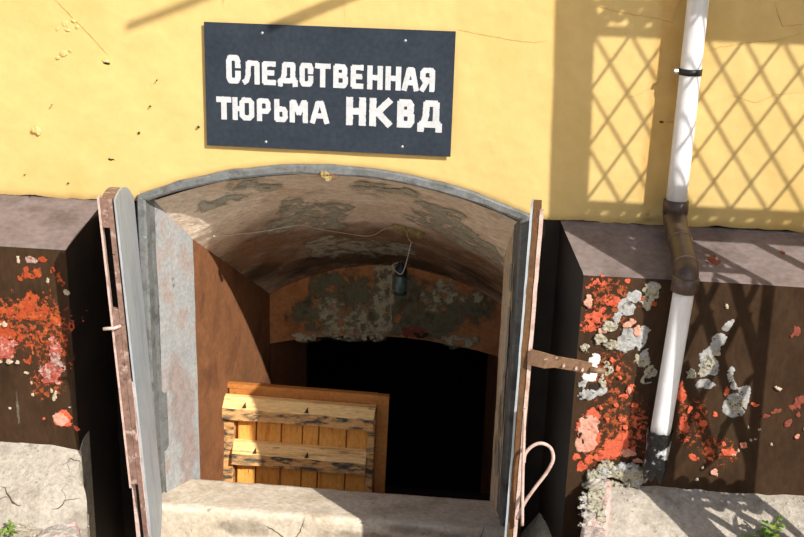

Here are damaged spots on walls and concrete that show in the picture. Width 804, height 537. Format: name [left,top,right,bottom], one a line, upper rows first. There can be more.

crack [704,6,803,52]
damp [199,180,282,213]
damp [350,181,504,268]
peeling [16,256,70,295]
damp [267,198,495,348]
peeling [0,290,75,401]
peeling [42,407,80,431]
peeling [573,275,662,537]
spalling [677,319,804,476]